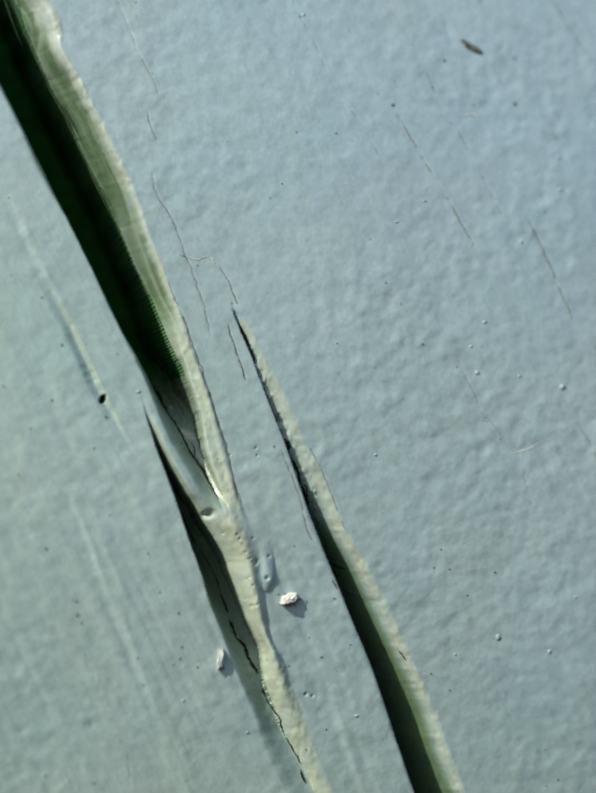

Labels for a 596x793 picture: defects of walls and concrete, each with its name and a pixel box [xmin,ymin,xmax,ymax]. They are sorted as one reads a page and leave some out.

crack [0,0,466,793]